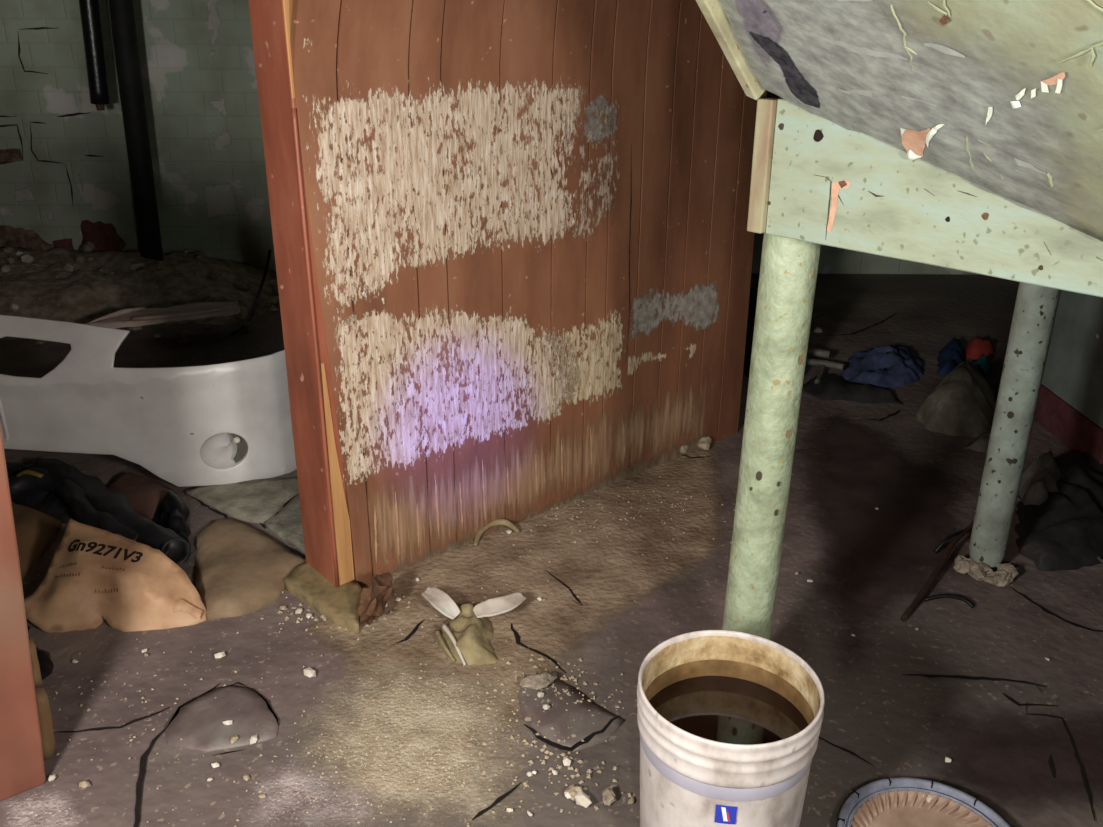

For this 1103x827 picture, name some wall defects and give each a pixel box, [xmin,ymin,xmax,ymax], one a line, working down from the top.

crack [1086,0,1103,12]
crack [1058,42,1103,68]
peeling [1010,72,1065,109]
water stain [720,0,1063,220]
spalling [0,148,23,163]
peeling [900,124,945,160]
spalling [0,220,126,252]
peeling [303,78,719,567]
crack [511,623,566,673]
crack [57,682,279,827]
crack [524,716,620,751]
crack [902,674,1096,821]